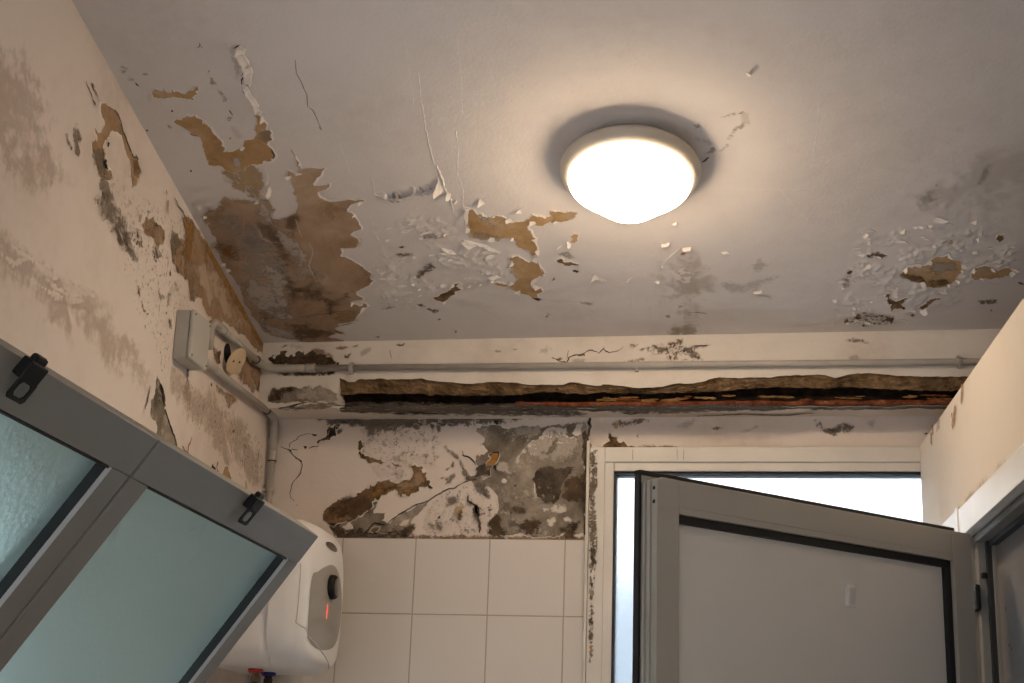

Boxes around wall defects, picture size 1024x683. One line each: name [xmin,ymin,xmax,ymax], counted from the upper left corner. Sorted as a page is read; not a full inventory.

peeling [91,100,141,188]
peeling [173,45,376,342]
crack [295,60,394,277]
crack [405,35,464,214]
damp [95,177,358,392]
peeling [431,282,464,305]
peeling [462,207,580,301]
peeling [835,240,1024,327]
crack [552,348,622,362]
peeling [145,374,192,453]
crack [282,433,318,501]
spalling [268,371,968,539]